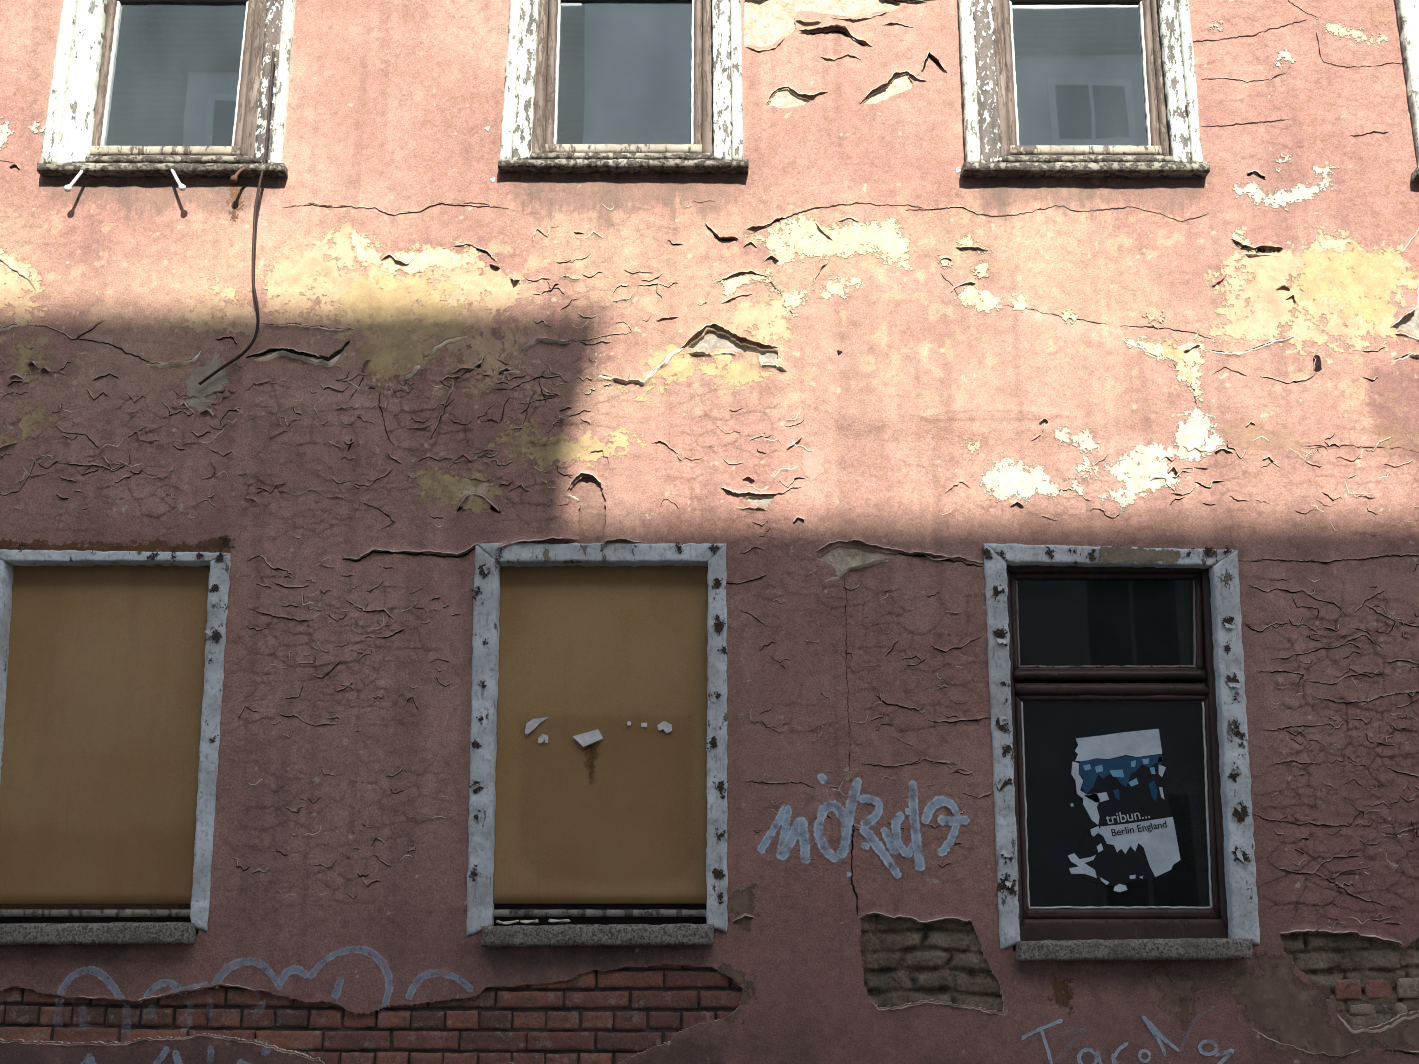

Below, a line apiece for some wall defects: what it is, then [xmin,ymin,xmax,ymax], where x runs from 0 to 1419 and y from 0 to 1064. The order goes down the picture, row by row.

spalling [858,50,948,104]
crack [283,201,508,216]
crack [0,319,684,530]
peeling [0,202,922,671]
peeling [937,222,1419,533]
crack [247,552,314,622]
crack [346,600,404,638]
spalling [0,964,757,1064]
spalling [813,813,1007,1018]
crack [844,567,994,798]
spalling [1230,604,1419,1064]
crack [1238,551,1419,924]